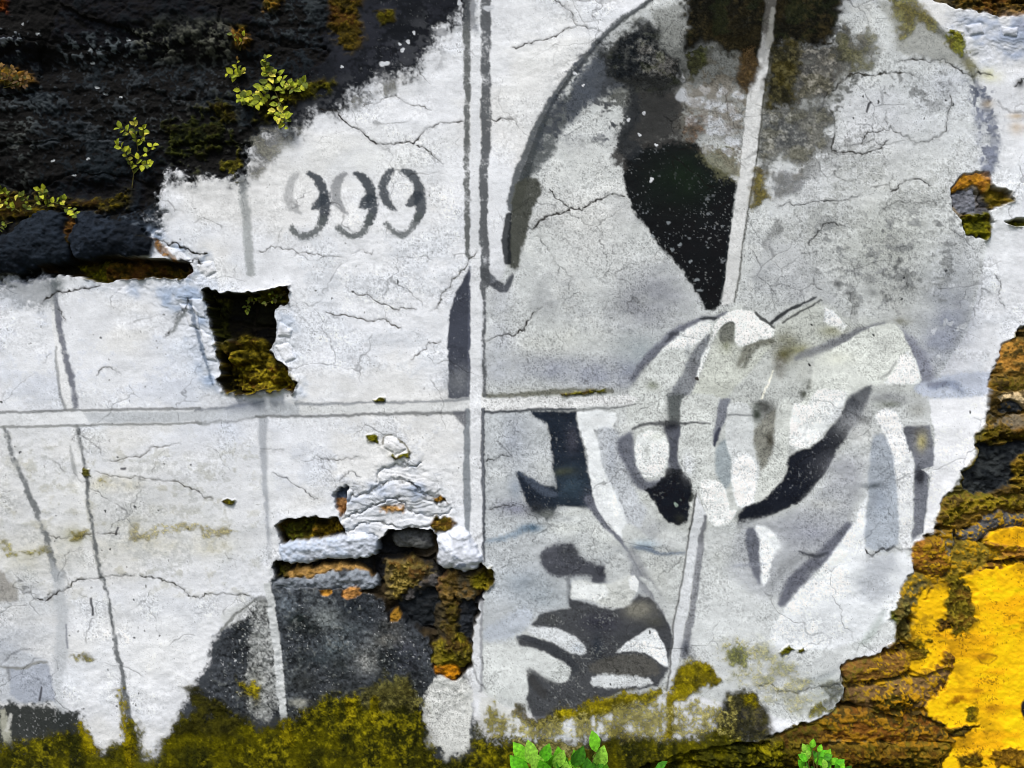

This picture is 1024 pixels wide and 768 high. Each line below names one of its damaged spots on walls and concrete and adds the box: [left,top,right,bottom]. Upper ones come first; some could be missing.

flaking render [933,0,1024,64]
spalling [0,0,364,401]
crack [319,106,462,156]
crack [533,190,625,242]
crack [826,58,924,155]
spalling [950,107,1024,242]
spalling [271,434,496,682]
spalling [755,326,1024,768]